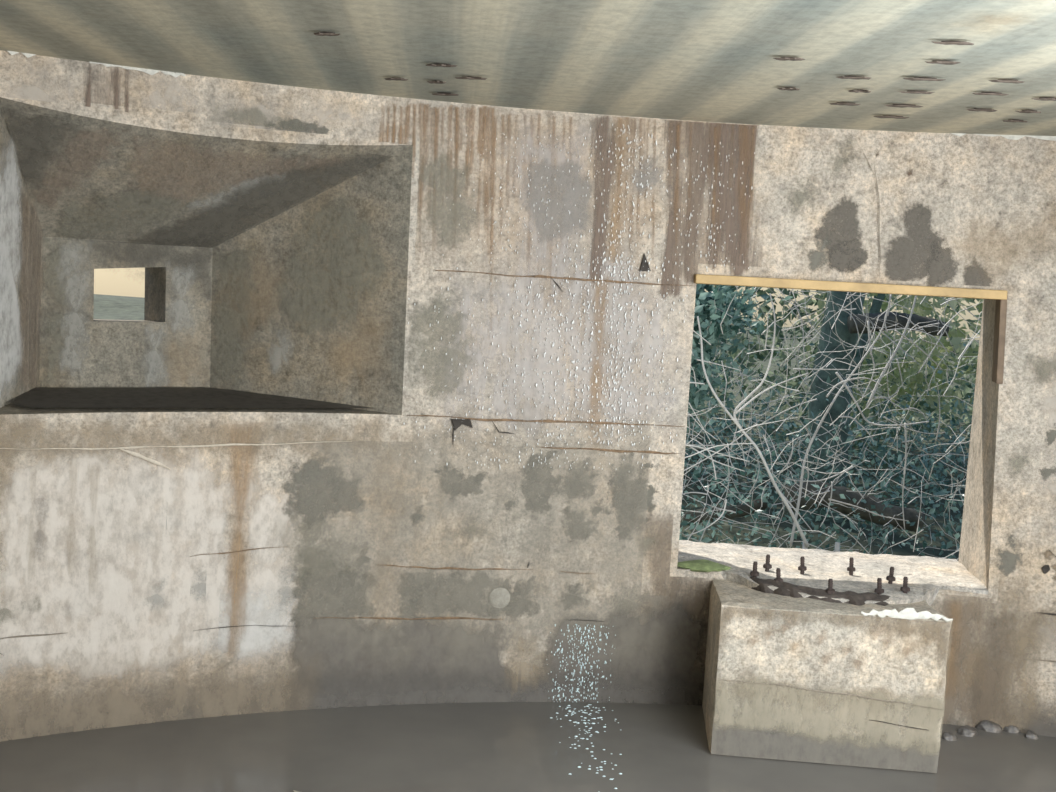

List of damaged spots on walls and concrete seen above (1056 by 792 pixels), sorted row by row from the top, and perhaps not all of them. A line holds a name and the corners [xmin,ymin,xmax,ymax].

rust [114,68,129,112]
rust [380,105,438,189]
rust [451,107,510,167]
rust [590,116,655,293]
rust [661,120,757,298]
leakage [807,198,868,272]
leakage [885,204,992,286]
leakage [403,123,756,548]
leakage [0,458,706,742]
leakage [719,607,952,661]